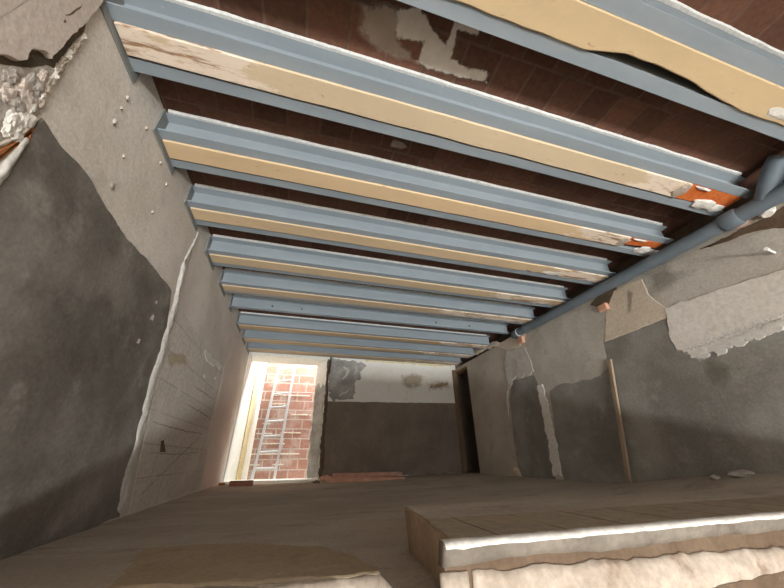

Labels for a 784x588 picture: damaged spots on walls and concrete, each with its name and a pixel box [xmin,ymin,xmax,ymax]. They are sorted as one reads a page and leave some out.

flaking render [0,0,103,159]
flaking render [683,317,784,359]
crack [137,387,213,498]